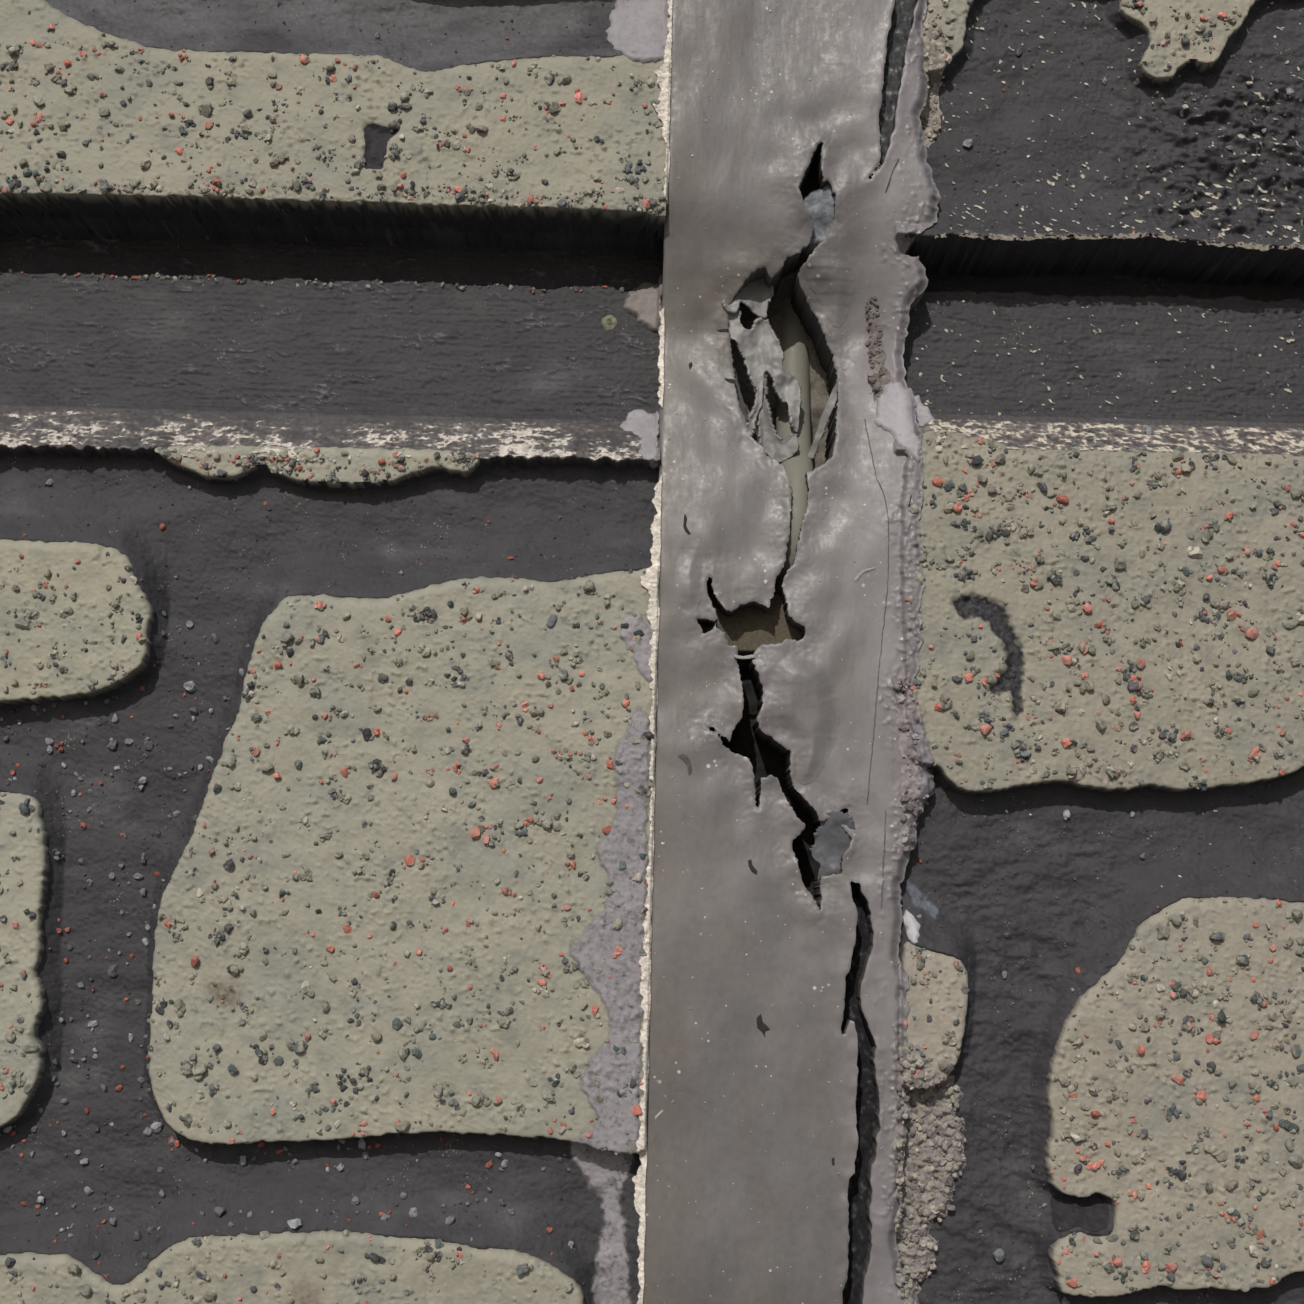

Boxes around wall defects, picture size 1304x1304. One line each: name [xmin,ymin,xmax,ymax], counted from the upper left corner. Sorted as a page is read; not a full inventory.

crack [869,0,918,193]
crack [697,142,912,1304]
spalling [892,1039,966,1304]